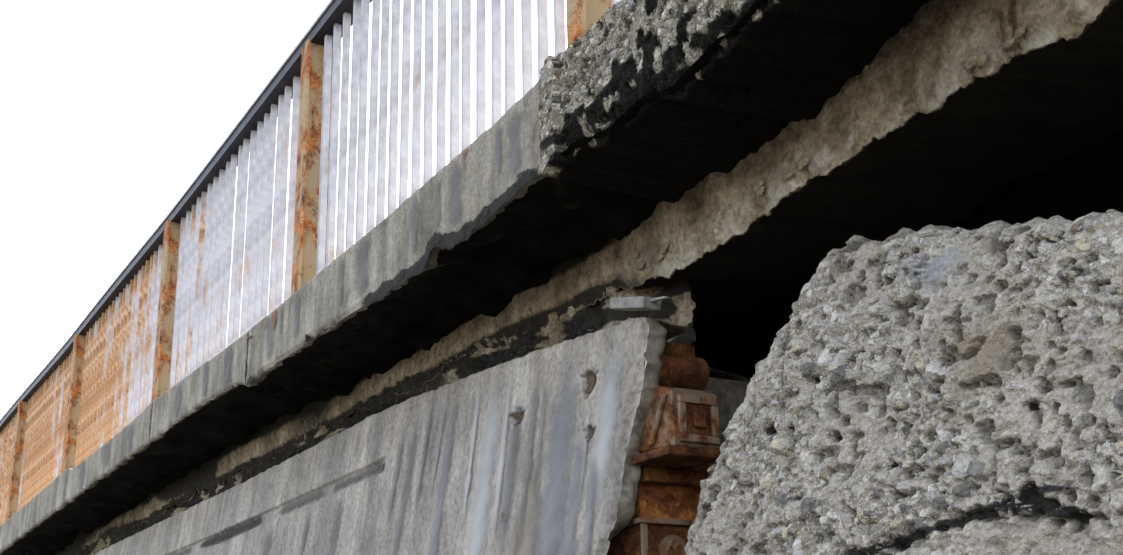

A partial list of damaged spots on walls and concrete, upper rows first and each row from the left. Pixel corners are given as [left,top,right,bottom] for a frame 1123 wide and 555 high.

spalling [538,0,931,203]
water stain [472,332,548,371]
water stain [562,310,605,341]
water stain [289,438,321,457]
water stain [338,404,395,433]
water stain [389,411,451,555]
water stain [464,374,616,555]
crack [835,482,1095,555]